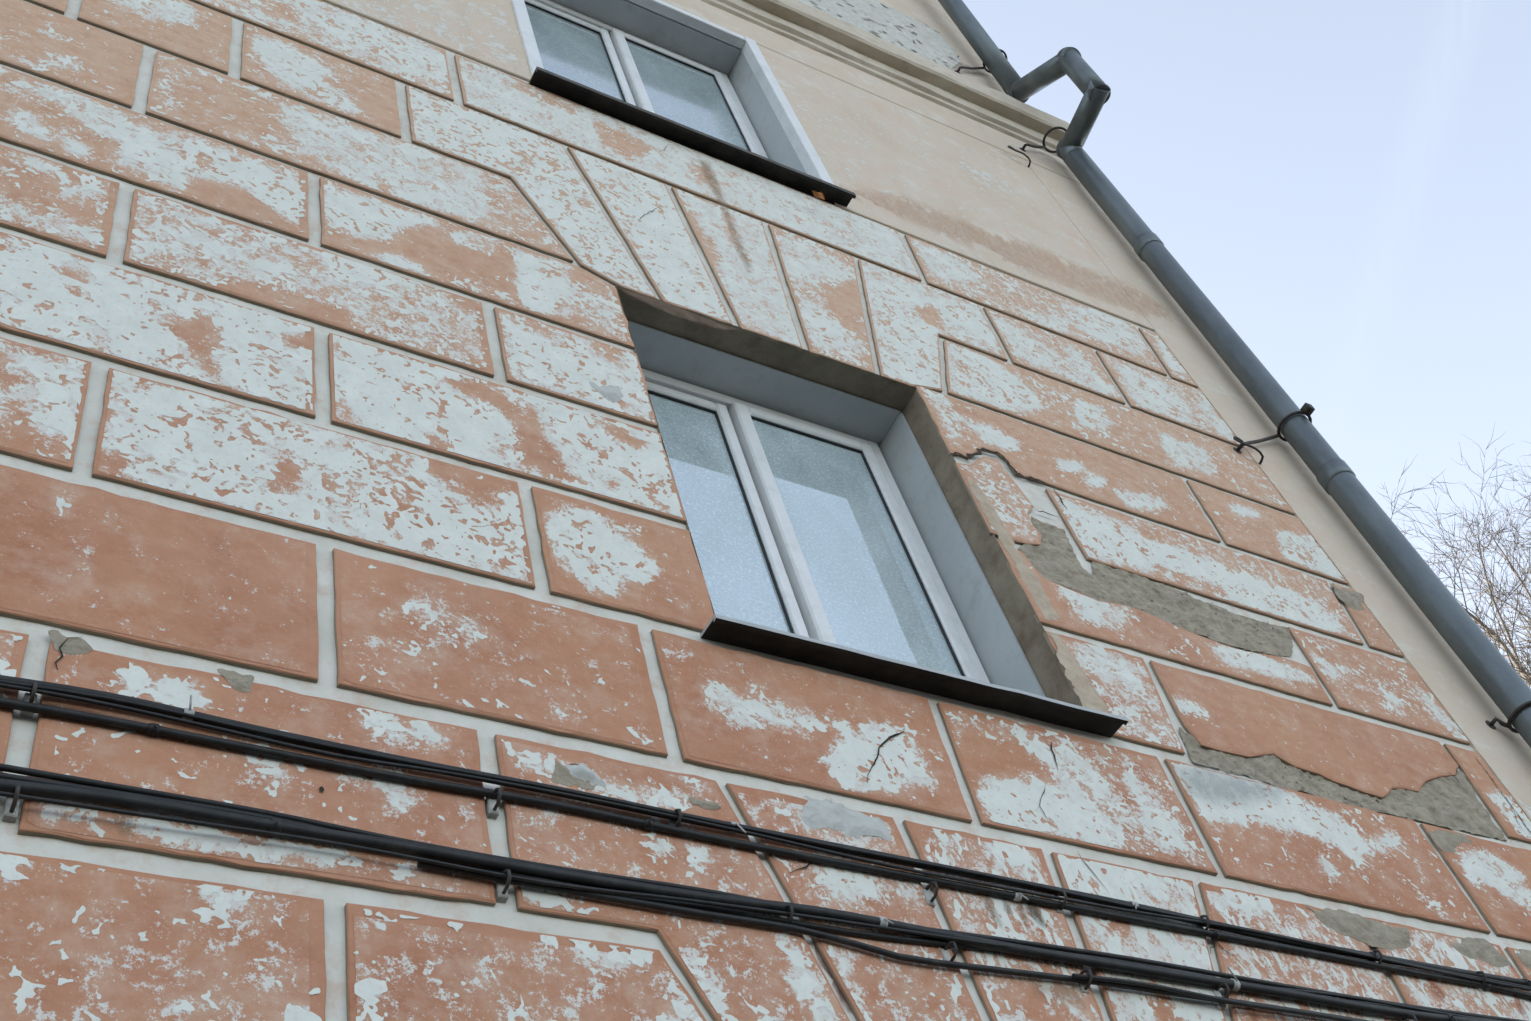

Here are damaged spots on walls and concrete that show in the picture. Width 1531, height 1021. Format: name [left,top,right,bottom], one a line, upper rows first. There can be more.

peeling [0,0,1468,748]
crack [952,447,1067,517]
peeling [0,466,490,898]
crack [868,727,905,774]
peeling [1048,632,1531,938]
peeling [0,853,322,1021]
peeling [353,909,703,1021]
peeling [501,739,980,1021]
peeling [911,827,1101,1021]
peeling [1057,854,1224,1021]
peeling [1206,889,1531,1021]